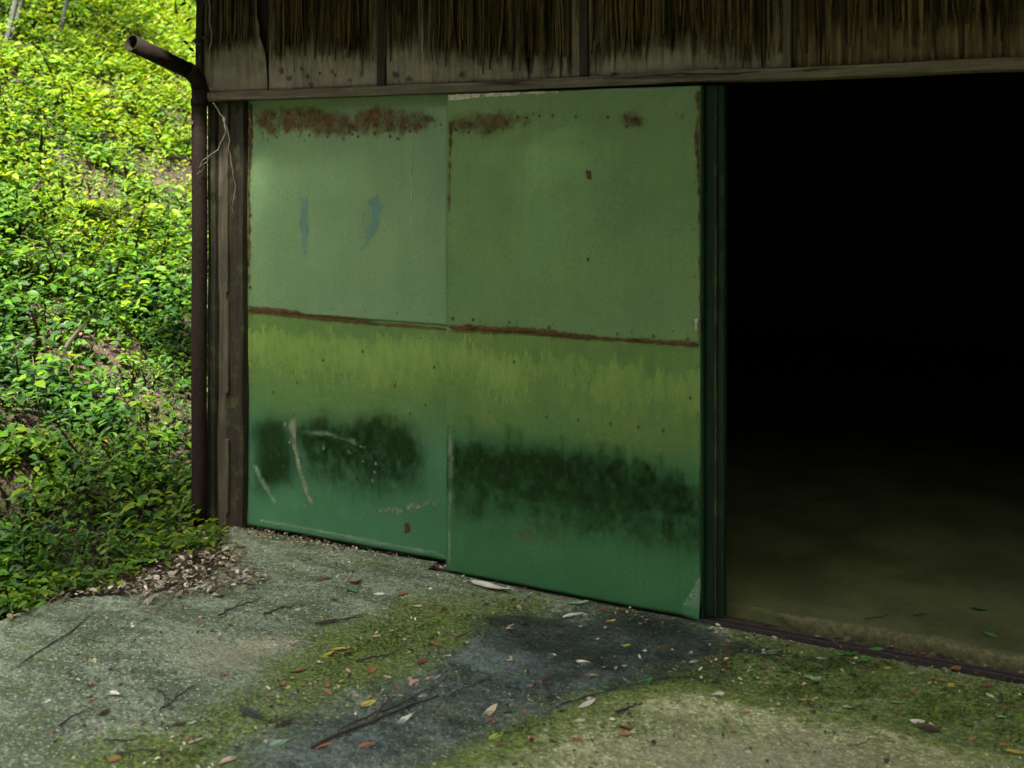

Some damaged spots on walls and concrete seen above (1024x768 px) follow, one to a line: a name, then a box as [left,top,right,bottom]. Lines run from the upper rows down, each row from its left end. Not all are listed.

corrosion [255,108,554,207]
corrosion [249,306,700,347]
leakage [256,418,420,486]
leakage [446,442,701,540]